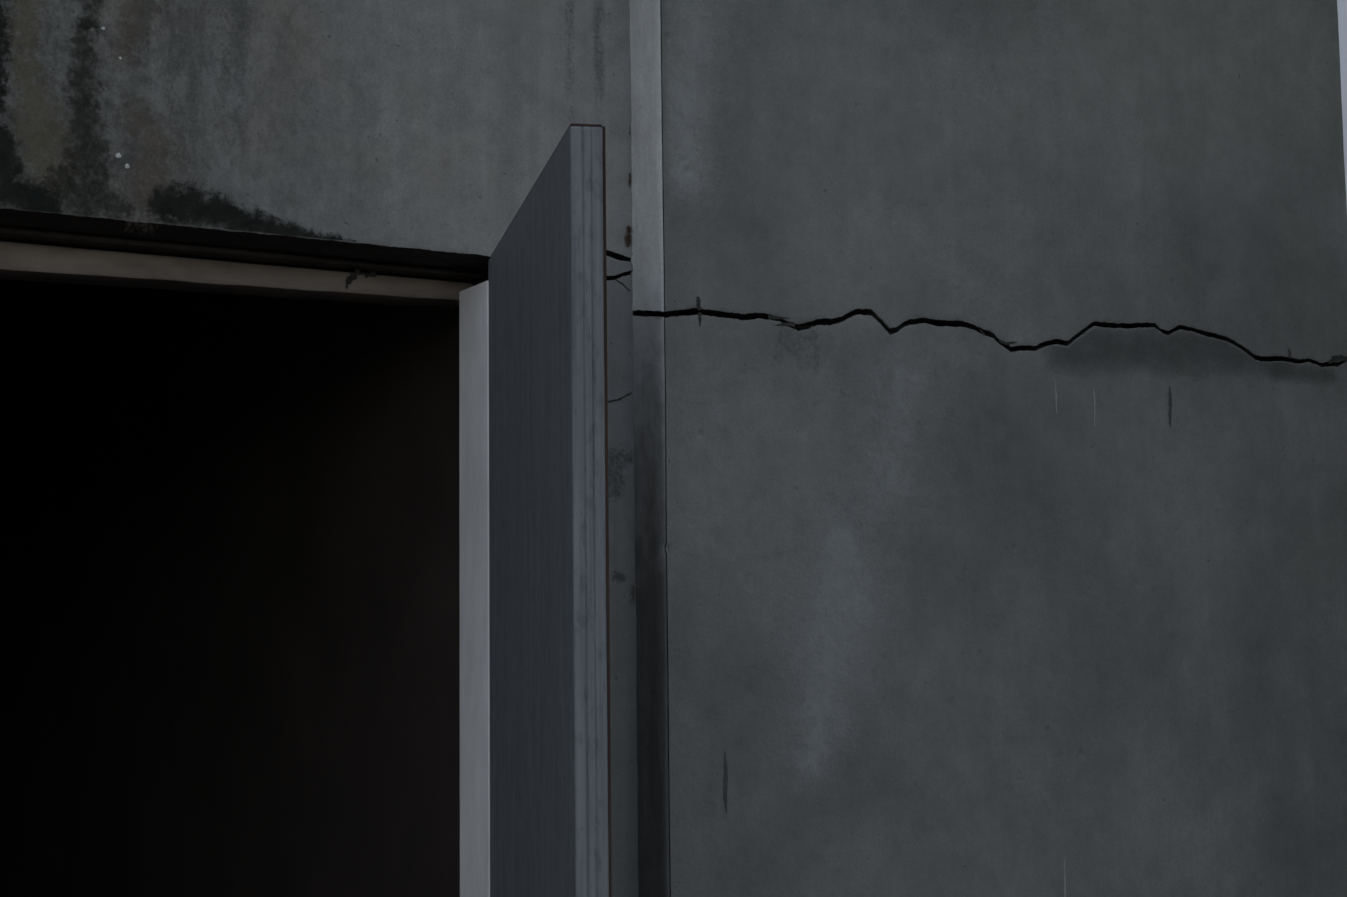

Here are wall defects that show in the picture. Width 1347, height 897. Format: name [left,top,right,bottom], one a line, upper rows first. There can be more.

water stain [0,4,13,103]
water stain [47,0,357,242]
crack [606,250,1347,367]